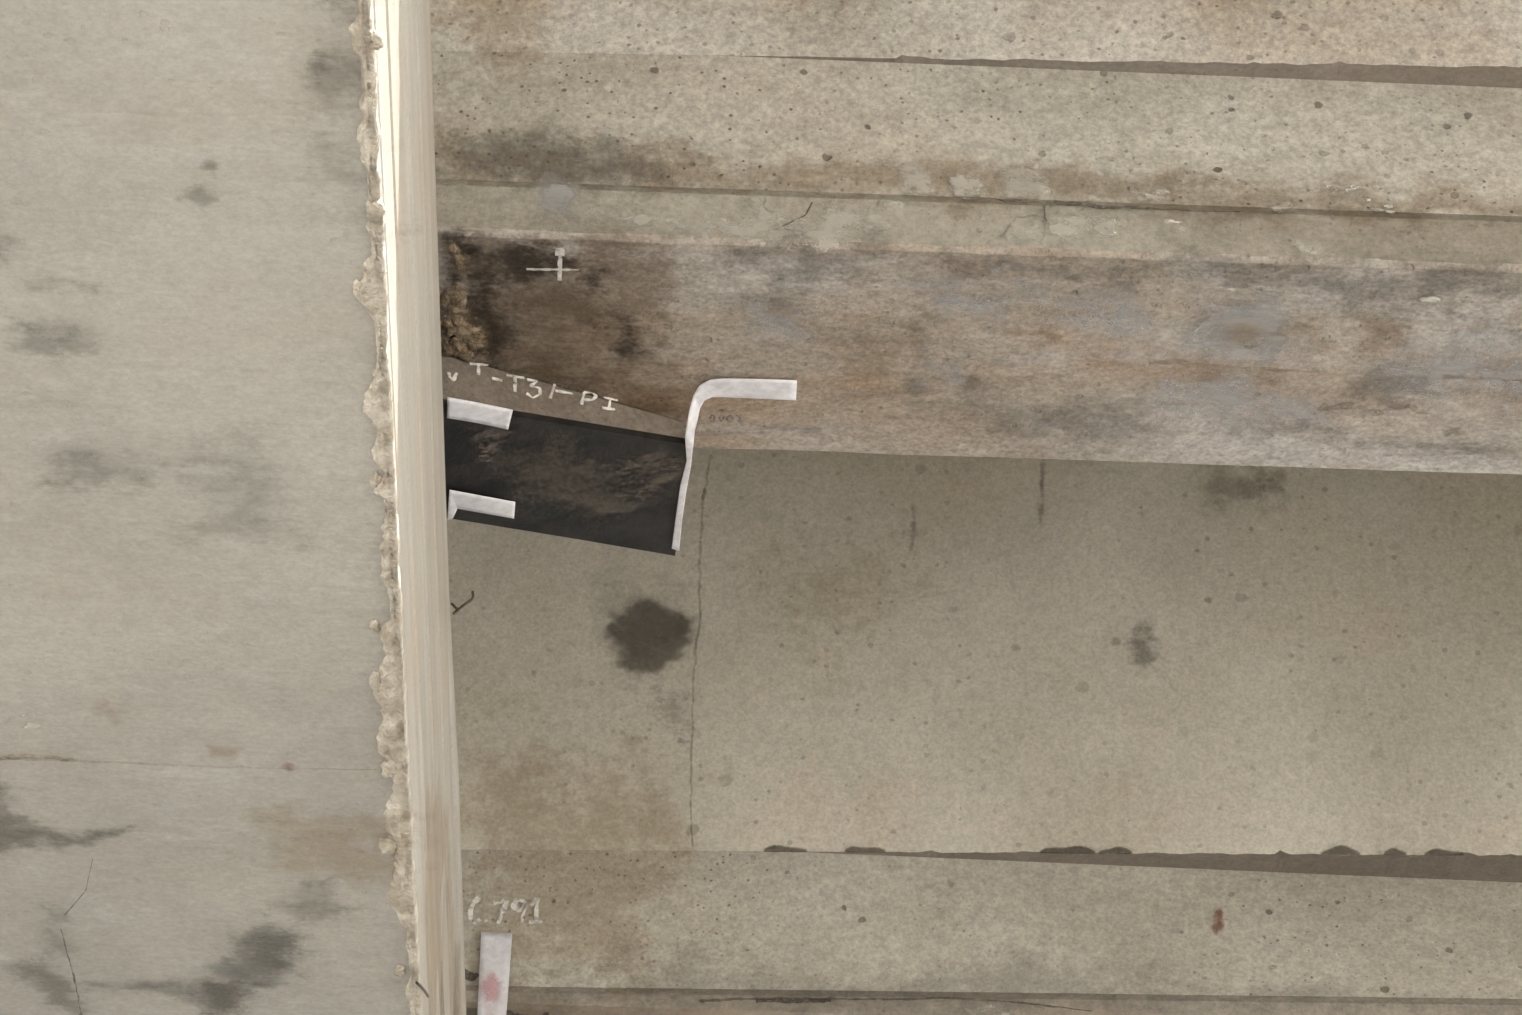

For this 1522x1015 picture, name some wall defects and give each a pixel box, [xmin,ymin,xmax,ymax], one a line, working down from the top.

crack [61,859,93,983]